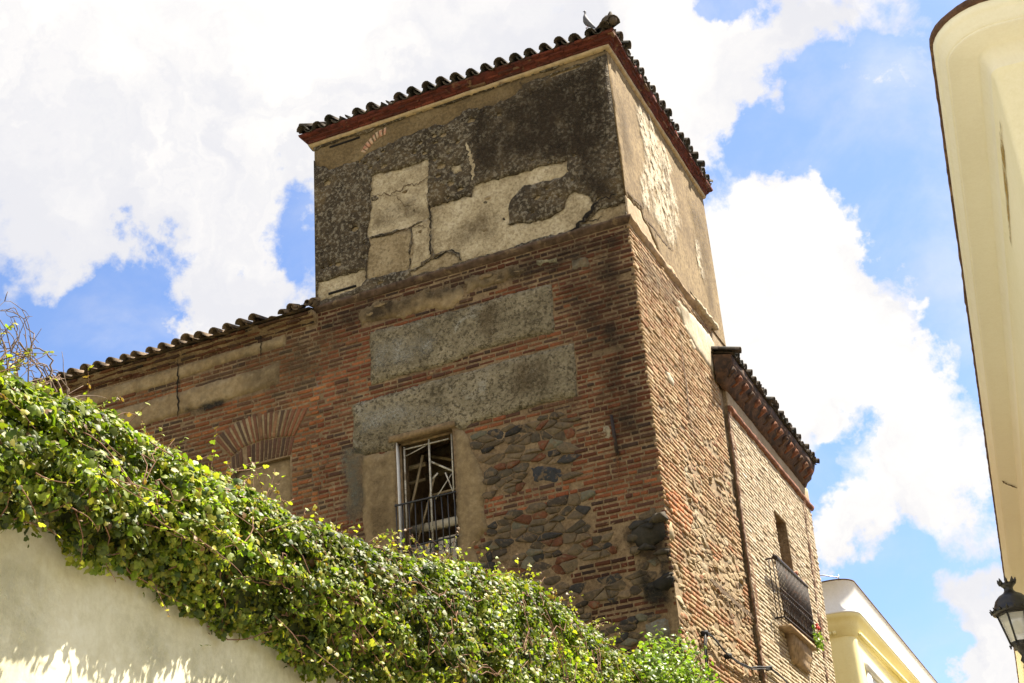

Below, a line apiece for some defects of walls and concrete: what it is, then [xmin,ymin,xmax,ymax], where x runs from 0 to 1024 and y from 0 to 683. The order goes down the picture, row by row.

crack [371,178,462,261]
flaking render [317,106,679,302]
crack [174,359,182,416]